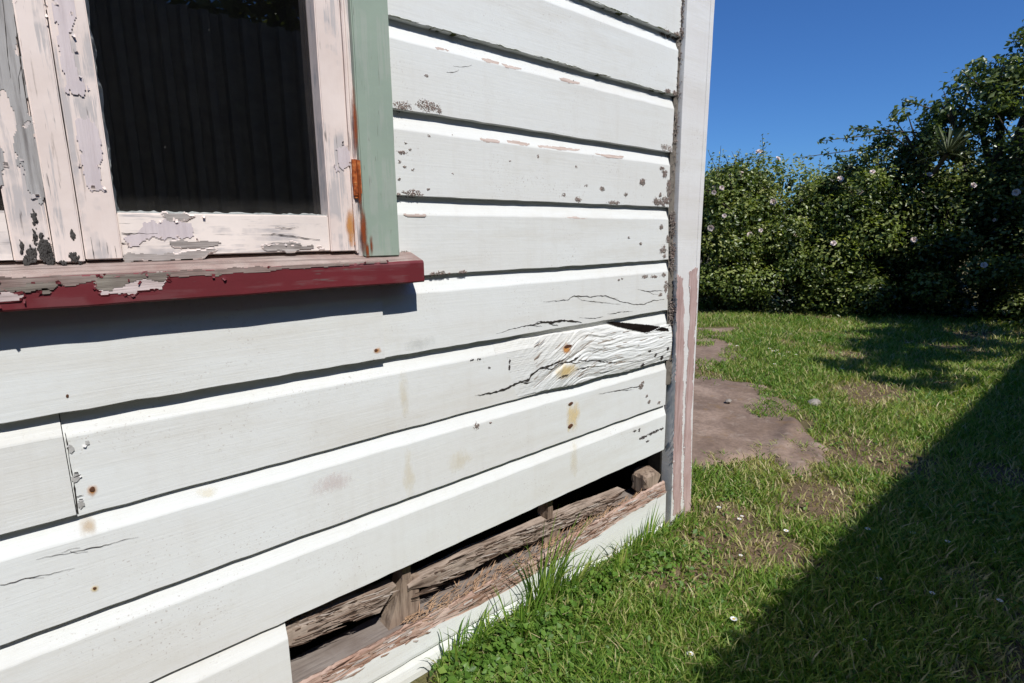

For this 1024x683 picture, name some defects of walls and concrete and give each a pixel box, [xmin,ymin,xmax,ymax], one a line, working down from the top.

peeling [0,0,45,204]
peeling [75,116,106,192]
peeling [480,138,580,151]
rust [347,171,373,255]
peeling [0,211,389,308]
crack [496,289,664,334]
crack [482,355,616,395]
peeling [672,267,698,516]
crack [3,537,137,585]